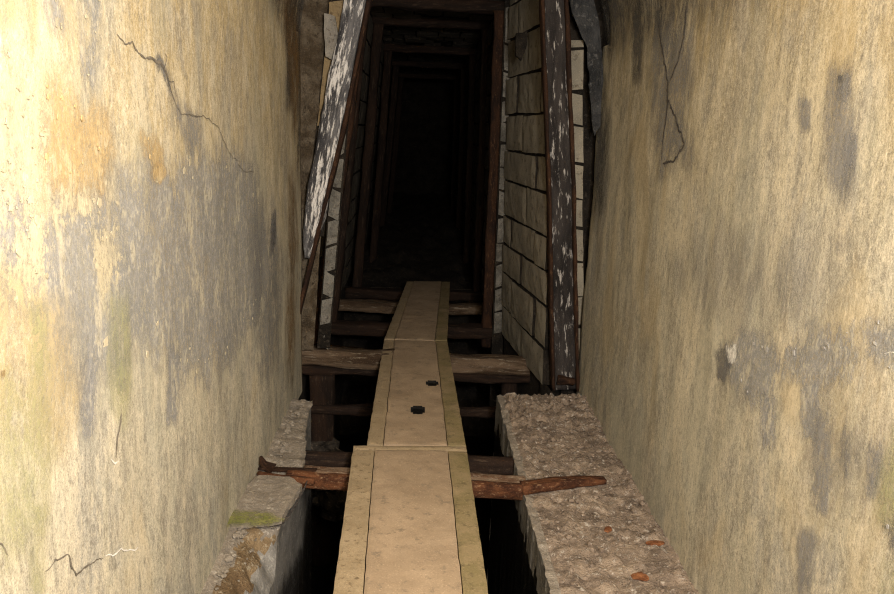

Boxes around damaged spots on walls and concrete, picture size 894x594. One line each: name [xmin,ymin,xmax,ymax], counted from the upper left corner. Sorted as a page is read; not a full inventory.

crack [117,34,254,173]
crack [651,8,692,177]
damp [799,100,810,130]
damp [825,71,856,196]
crack [45,547,138,576]